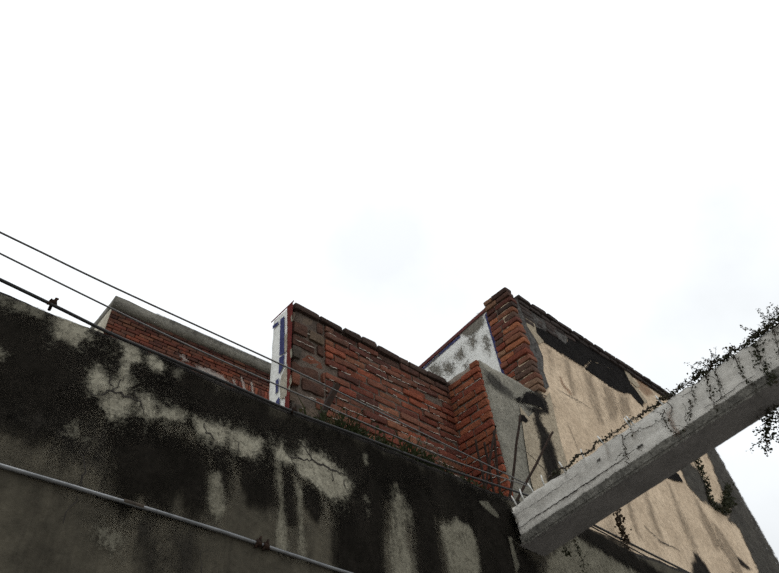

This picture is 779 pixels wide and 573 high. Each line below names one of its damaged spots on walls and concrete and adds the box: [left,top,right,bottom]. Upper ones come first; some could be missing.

crack [90,375,144,413]
damp [0,295,539,573]
crack [288,444,348,488]